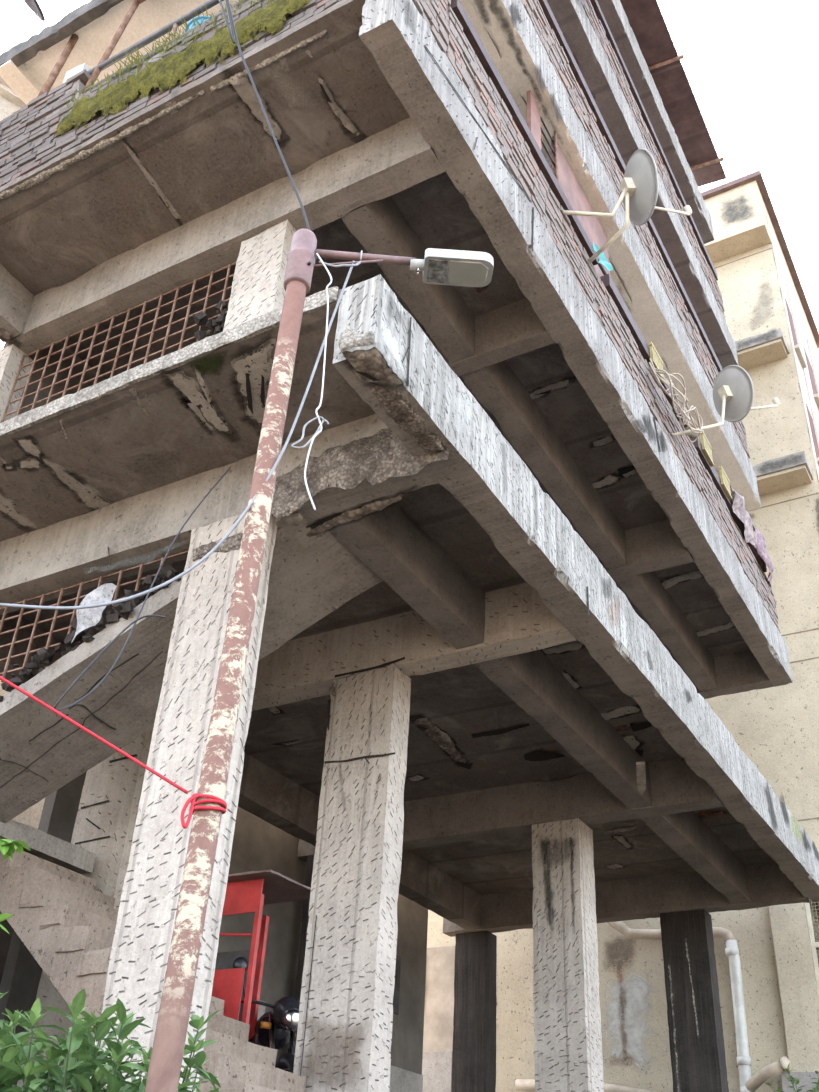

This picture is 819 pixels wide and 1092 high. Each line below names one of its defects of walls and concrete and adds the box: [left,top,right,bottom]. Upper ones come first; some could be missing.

leakage [476,0,562,120]
peeling [160,368,238,442]
peeling [231,338,276,434]
spalling [342,346,447,453]
peeling [0,492,37,529]
peeling [1,435,113,511]
spalling [275,487,414,537]
crack [0,651,163,788]
peeling [409,714,473,769]
crack [75,800,110,845]
leakage [541,841,554,921]